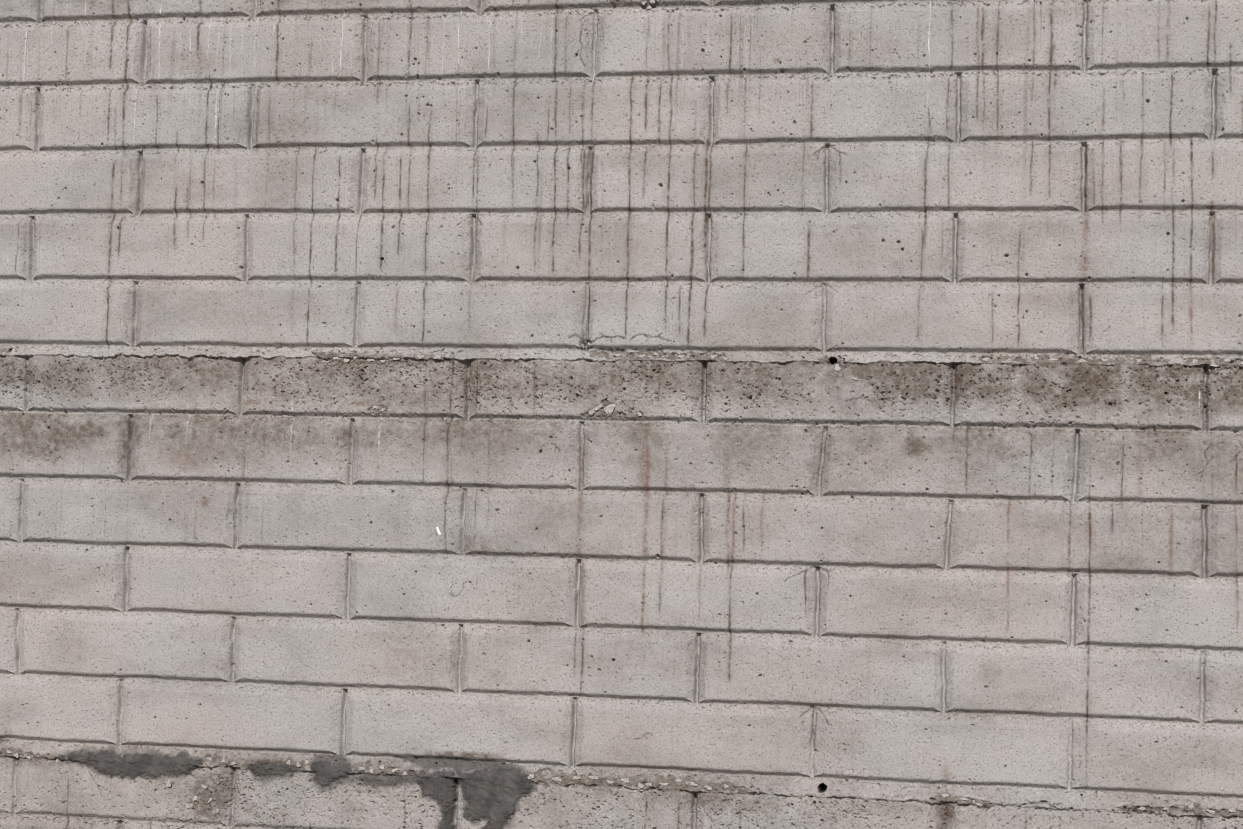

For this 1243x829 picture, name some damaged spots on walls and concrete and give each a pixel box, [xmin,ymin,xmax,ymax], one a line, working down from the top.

leakage [552,150,594,266]
leakage [691,142,711,263]